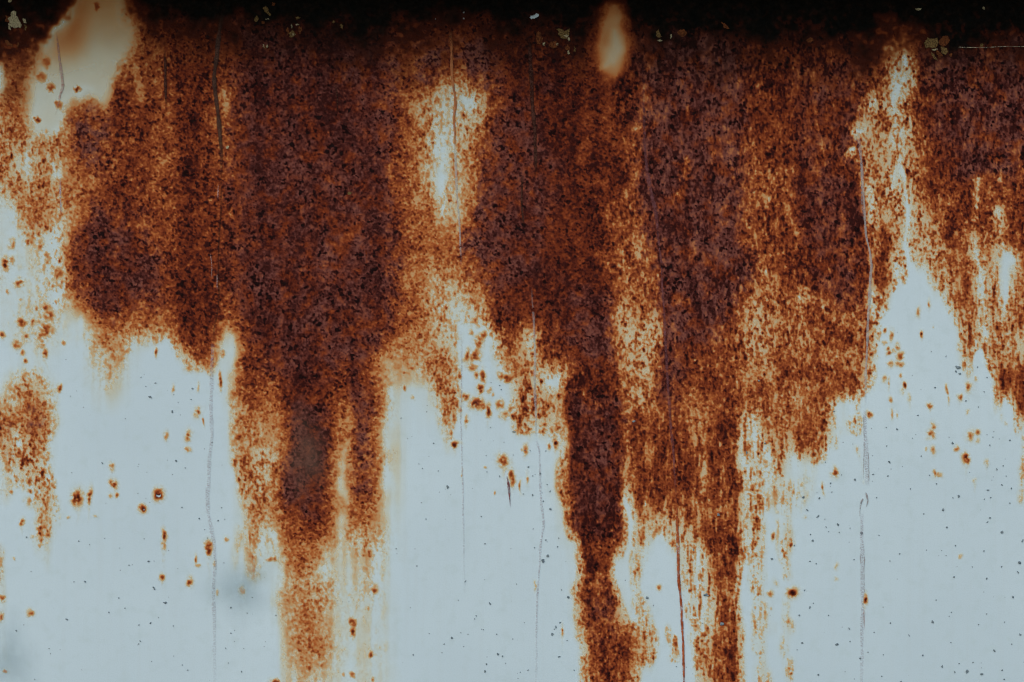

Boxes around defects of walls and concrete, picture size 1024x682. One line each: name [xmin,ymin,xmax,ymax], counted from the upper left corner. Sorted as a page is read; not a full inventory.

corrosion [0,0,498,682]
corrosion [484,0,1024,682]